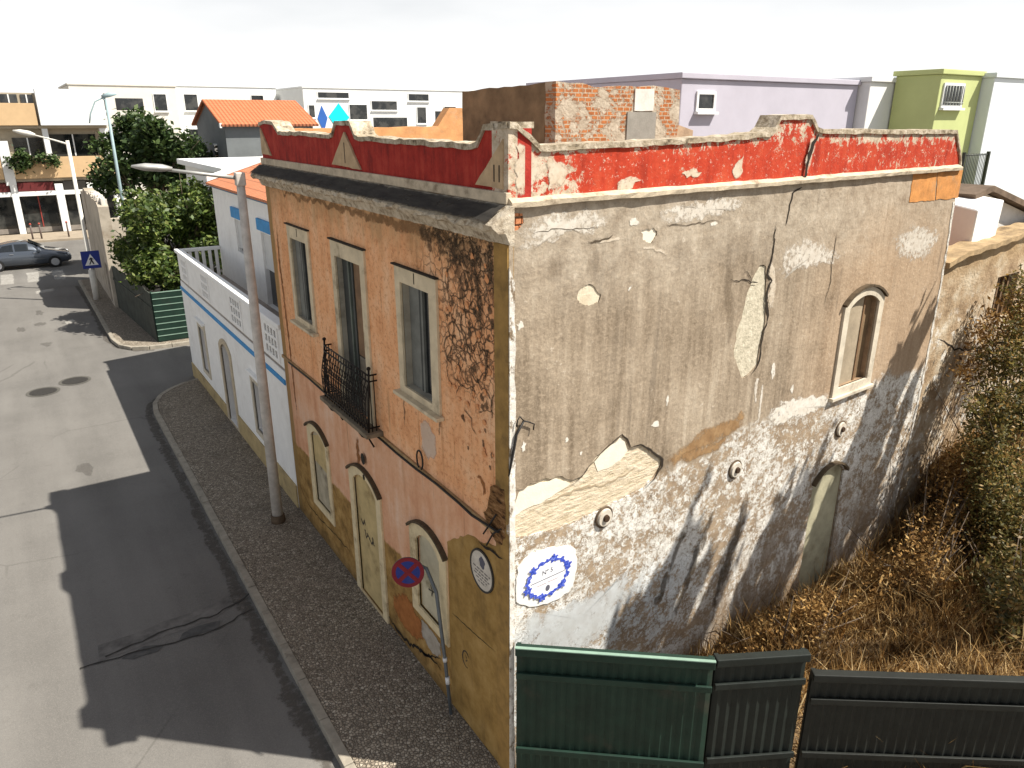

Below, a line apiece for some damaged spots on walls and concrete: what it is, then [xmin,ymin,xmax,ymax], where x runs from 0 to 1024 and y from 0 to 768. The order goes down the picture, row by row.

peeling [515,144,568,195]
peeling [618,176,640,190]
peeling [683,167,701,178]
spalling [577,285,600,306]
spalling [734,266,766,377]
crack [731,134,819,375]
water stain [671,378,763,465]
spalling [479,434,664,559]
water stain [655,533,685,603]
water stain [675,518,712,614]
water stain [713,502,747,605]
crack [389,617,441,670]